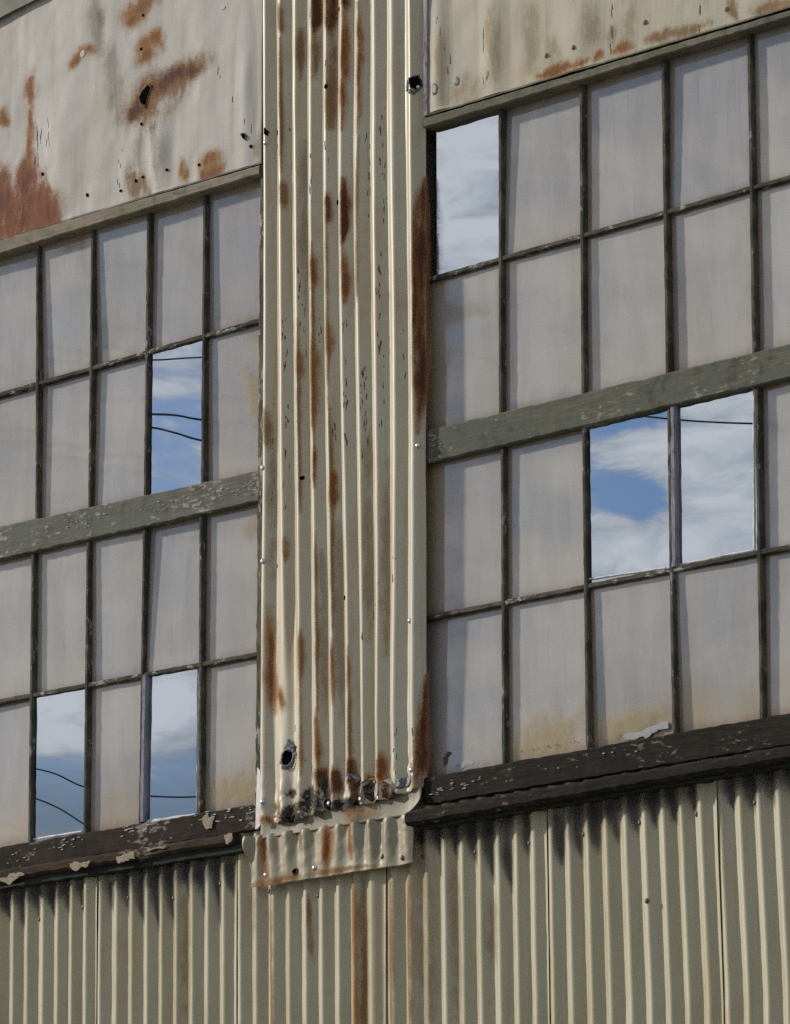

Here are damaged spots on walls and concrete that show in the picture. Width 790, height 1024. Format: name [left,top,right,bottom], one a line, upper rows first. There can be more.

rust [127,27,205,129]
rust [535,40,633,78]
rust [0,76,61,239]
rust [255,0,430,1024]
peeling [622,721,669,752]
peeling [0,852,25,885]
damp [0,882,83,924]
peeling [116,846,166,864]
damp [108,858,235,926]
peeling [194,807,253,829]
damp [418,814,530,884]
damp [553,787,696,860]